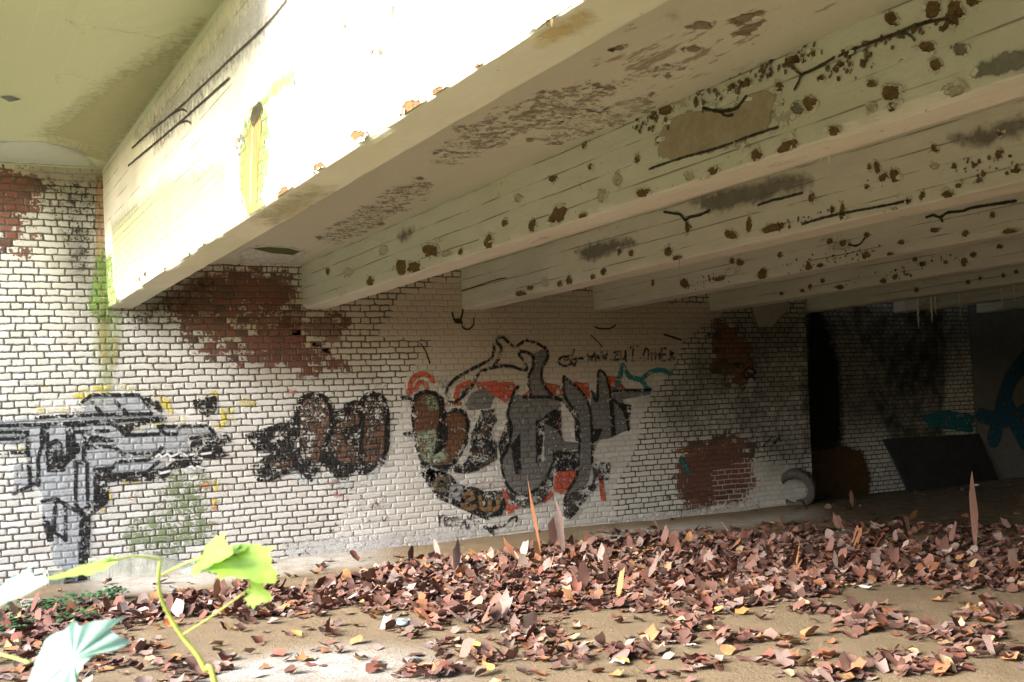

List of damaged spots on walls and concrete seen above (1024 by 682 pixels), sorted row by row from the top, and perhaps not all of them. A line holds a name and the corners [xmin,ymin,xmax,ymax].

crack [128,0,287,167]
peeling [433,42,823,182]
crack [649,95,779,170]
crack [791,17,948,91]
spalling [527,202,588,233]
crack [663,209,710,228]
water stain [691,177,809,210]
crack [801,200,1017,225]
water stain [37,167,226,385]
spalling [378,242,464,277]
peeling [258,305,351,381]
peeling [666,444,754,512]